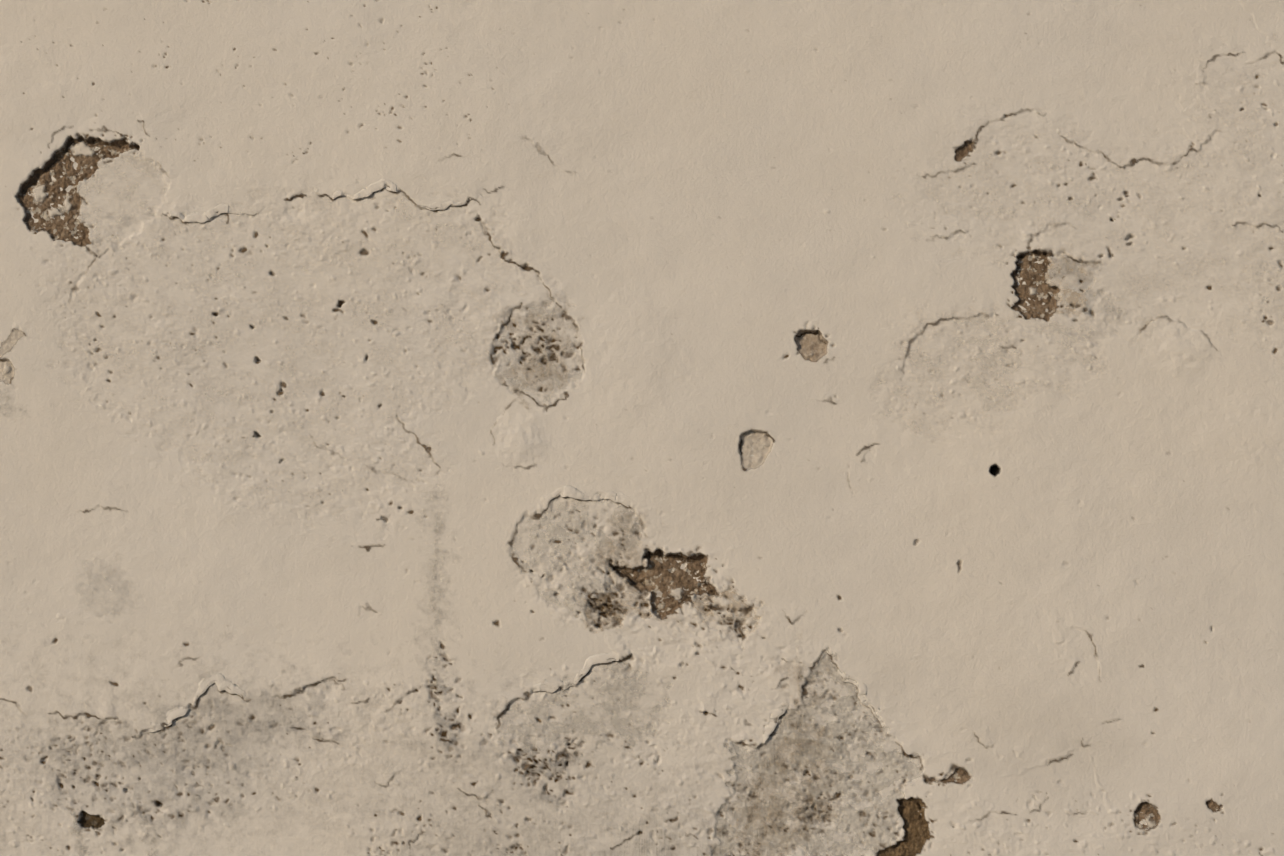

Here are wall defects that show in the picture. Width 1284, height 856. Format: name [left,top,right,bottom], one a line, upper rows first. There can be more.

spalling [16,135,140,246]
crack [1104,148,1196,168]
crack [163,178,562,308]
spalling [1011,250,1060,321]
spalling [0,329,26,384]
spalling [795,330,828,362]
spalling [739,430,775,471]
spalling [610,549,759,624]
crack [49,664,250,738]
crack [284,679,369,742]
peeling [712,647,970,856]
spalling [1134,802,1160,829]